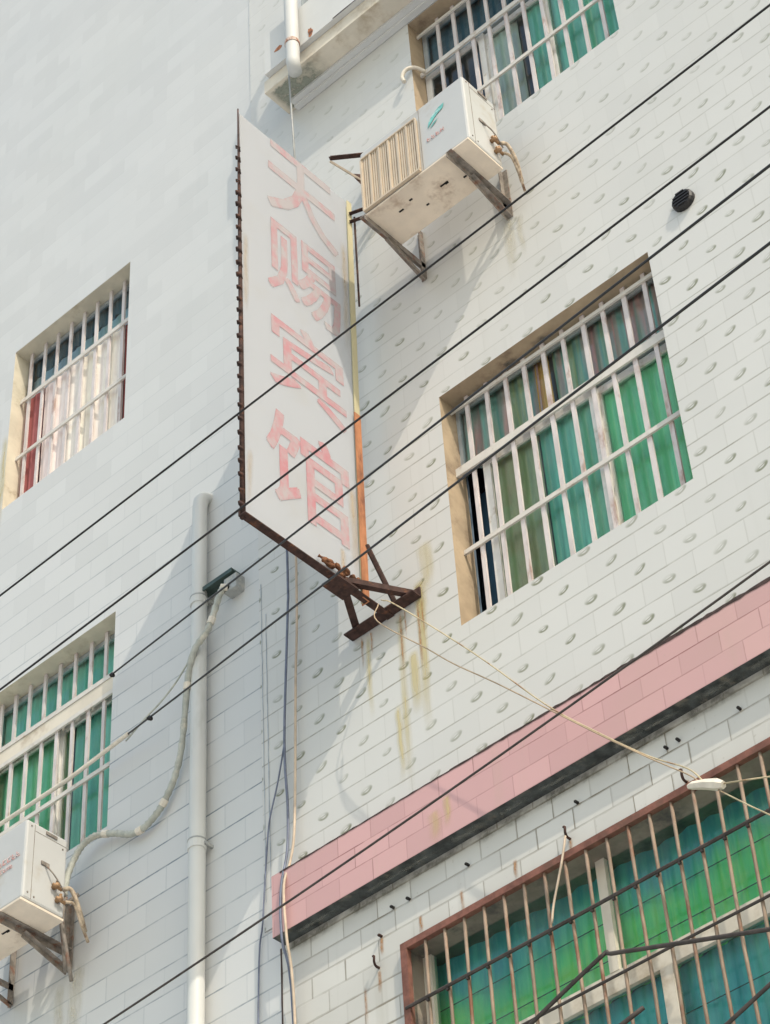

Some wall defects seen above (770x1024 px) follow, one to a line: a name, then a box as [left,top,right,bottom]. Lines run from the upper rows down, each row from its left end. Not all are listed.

rust [400,600,426,690]